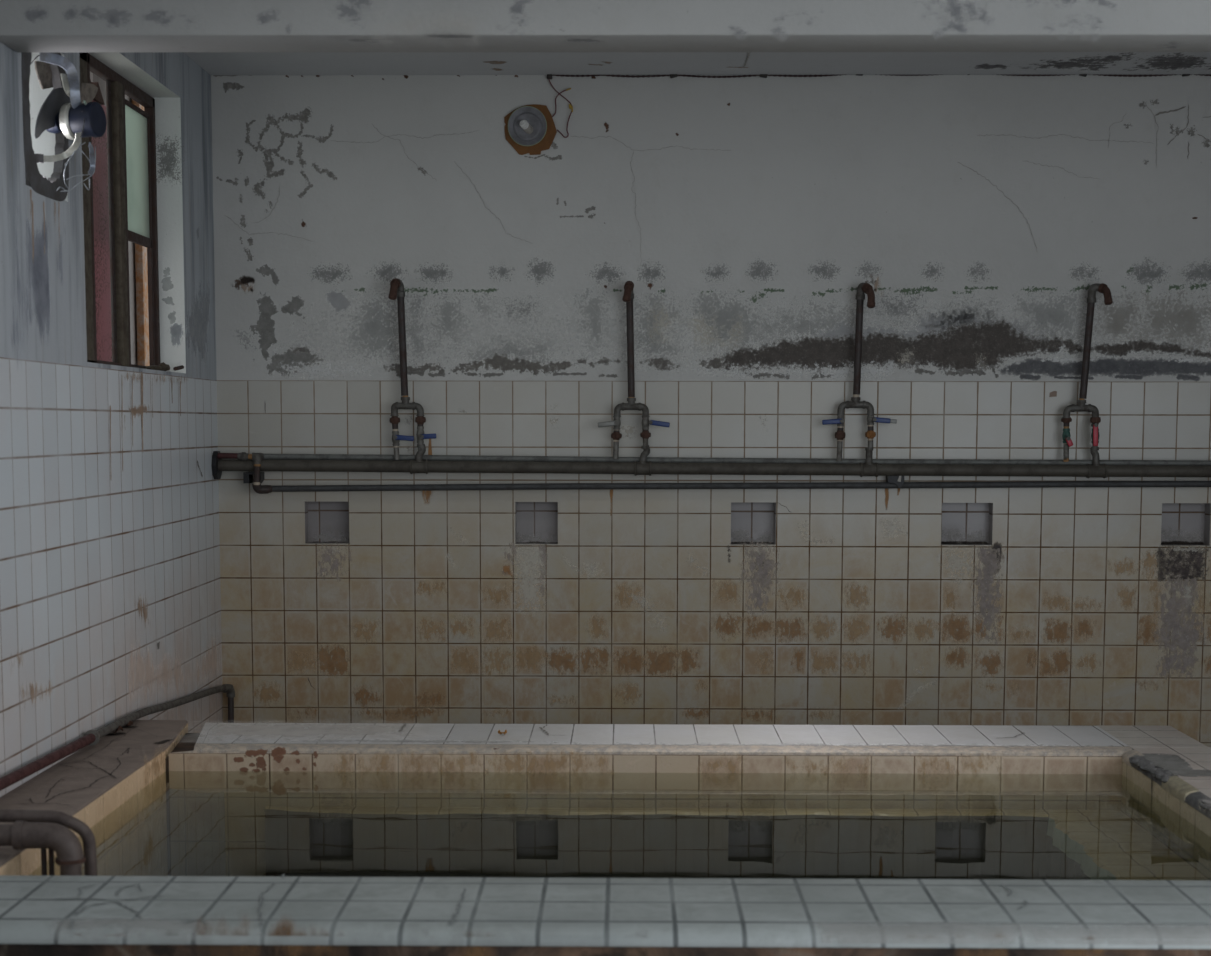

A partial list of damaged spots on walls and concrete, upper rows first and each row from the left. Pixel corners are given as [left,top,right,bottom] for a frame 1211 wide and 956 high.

spalling [216,120,324,377]
leakage [279,258,1211,381]
leakage [716,542,1030,689]
leakage [1115,545,1211,678]
corrosion [234,746,318,772]
spalling [1129,753,1211,783]